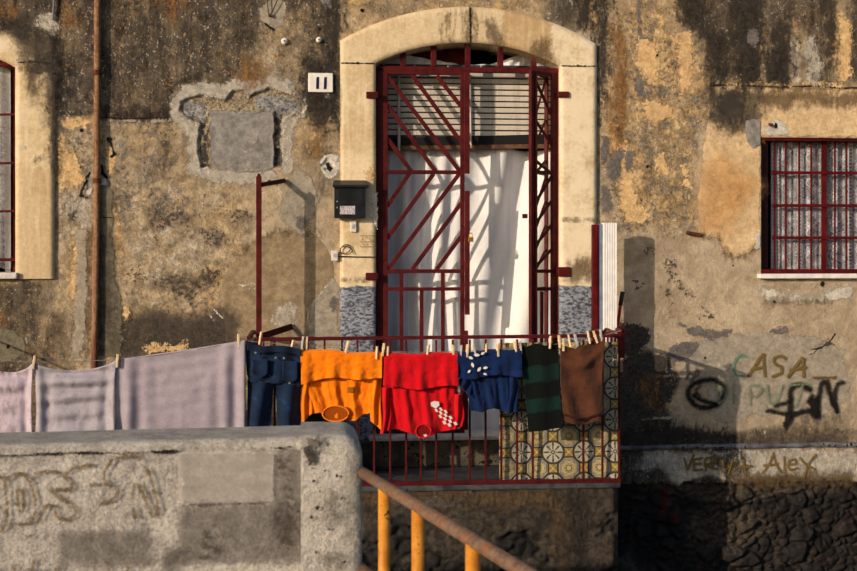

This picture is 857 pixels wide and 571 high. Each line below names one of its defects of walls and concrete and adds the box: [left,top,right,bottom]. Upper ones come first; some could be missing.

damp [0,15,64,174]
damp [100,103,174,125]
spalling [175,85,308,174]
peeling [599,121,651,224]
peeling [633,0,680,123]
peeling [675,31,694,95]
peeling [653,87,857,259]
damp [673,0,857,132]
damp [66,228,93,358]